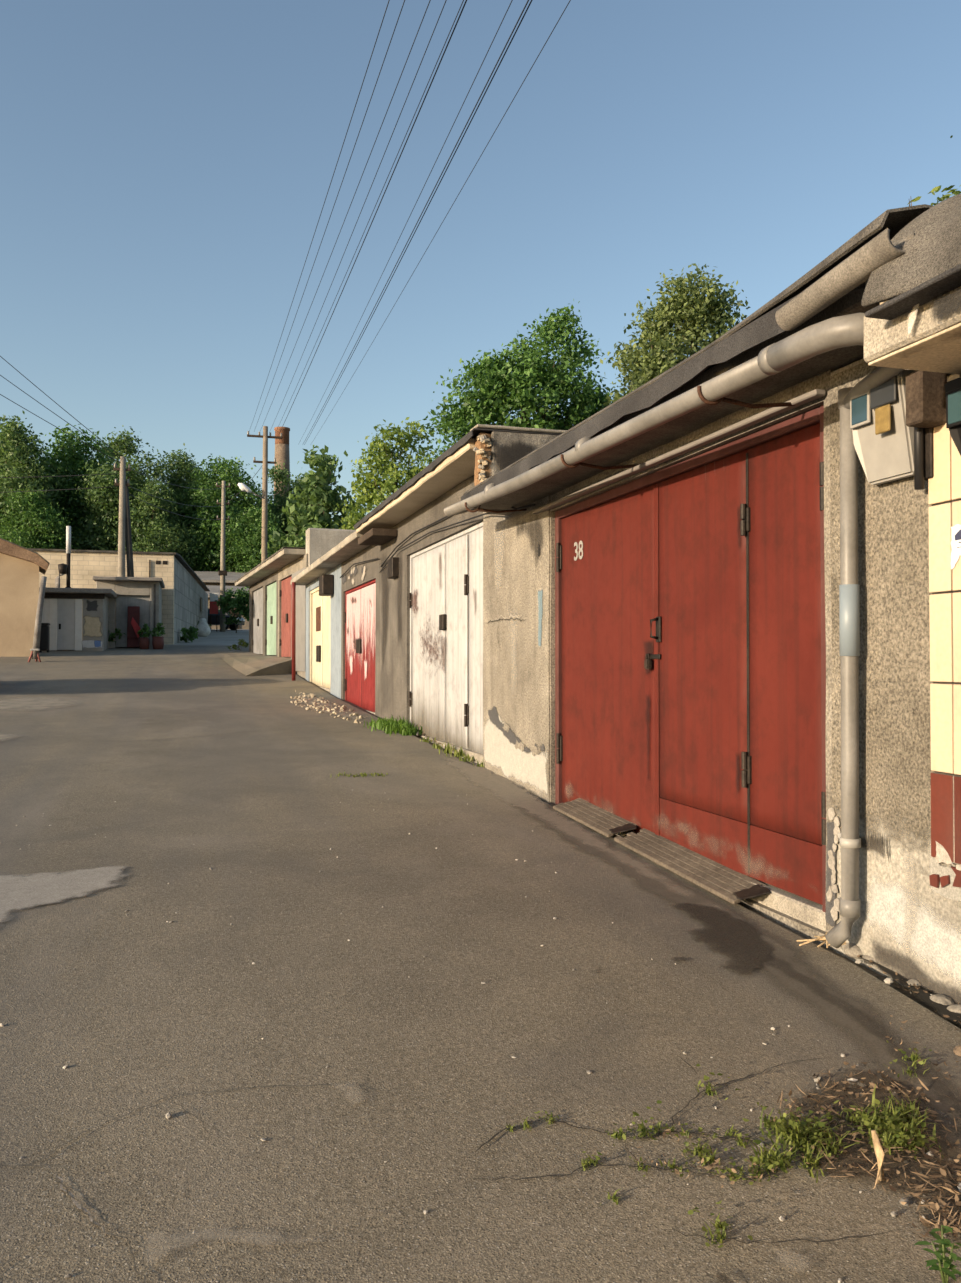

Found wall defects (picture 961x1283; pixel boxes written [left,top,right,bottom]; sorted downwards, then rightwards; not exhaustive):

peeling [341,565,376,678]
spalling [484,706,548,794]
spalling [929,841,961,902]
crack [4,1084,397,1283]
crack [470,1118,814,1180]